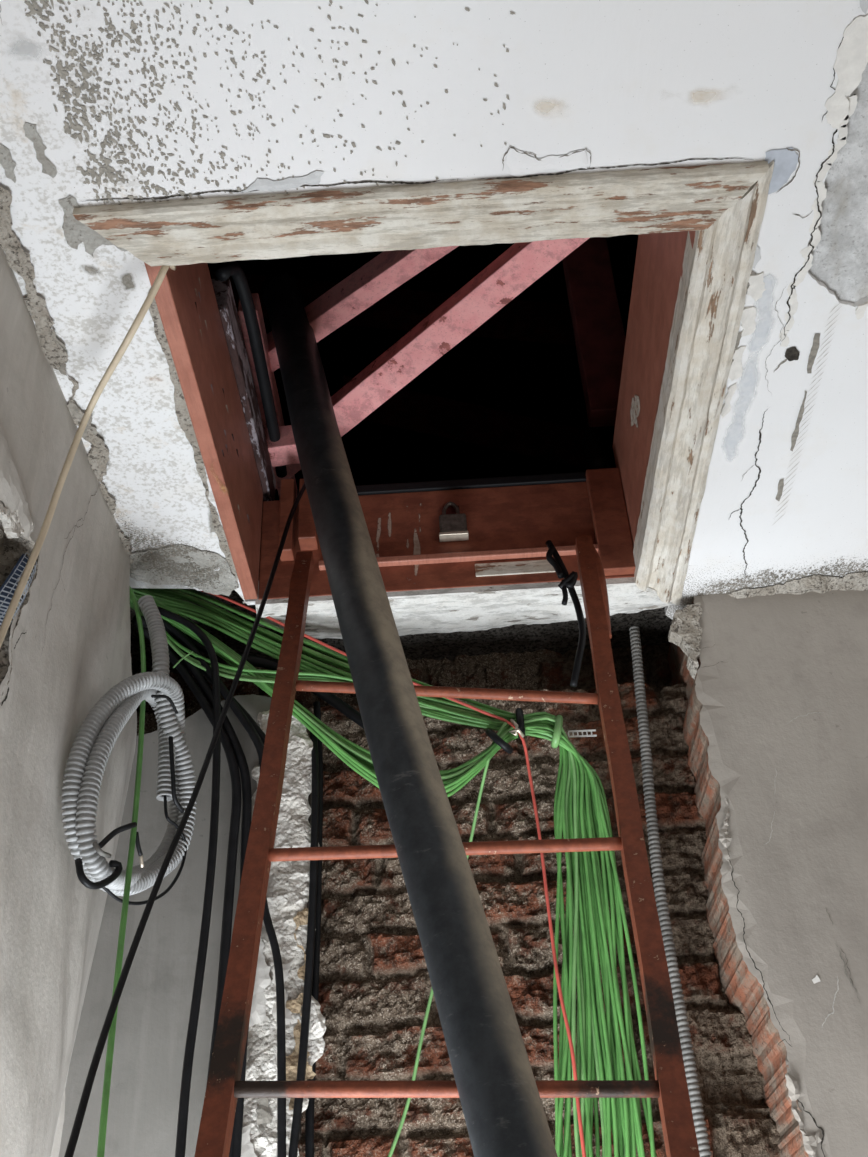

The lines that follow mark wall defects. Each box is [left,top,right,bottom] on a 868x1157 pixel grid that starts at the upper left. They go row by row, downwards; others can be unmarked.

flaking render [0,144,16,183]
peeling [23,0,800,258]
flaking render [808,0,868,320]
crack [730,19,858,577]
peeling [720,246,774,460]
spalling [774,334,820,373]
spalling [790,391,807,451]
spalling [776,479,784,501]
flaking render [0,500,34,588]
flaking render [668,603,703,680]
flaking render [719,797,732,867]
flaking render [785,1058,822,1157]